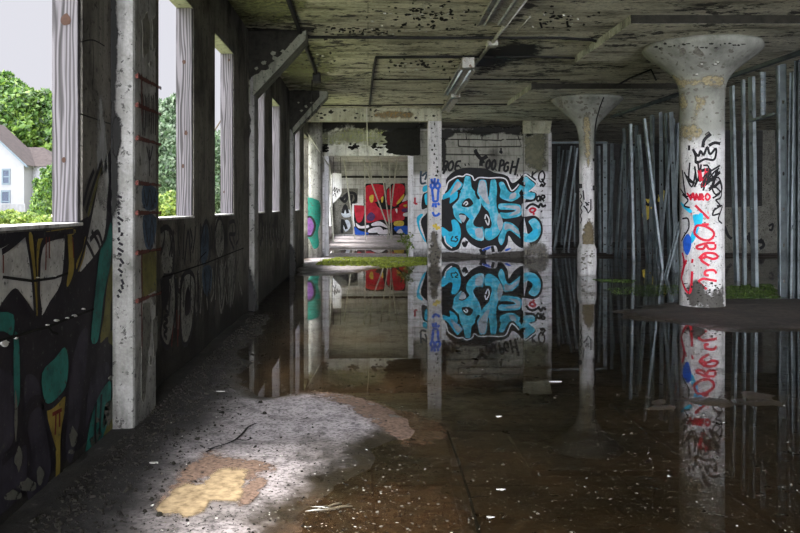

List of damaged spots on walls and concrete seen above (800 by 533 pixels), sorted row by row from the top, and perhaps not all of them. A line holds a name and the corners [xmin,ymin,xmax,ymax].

peeling [324,1,470,41]
peeling [249,28,315,86]
damp [475,39,542,72]
corrosion [135,73,161,121]
peeling [654,42,748,122]
peeling [371,111,435,156]
corrosion [135,248,161,346]